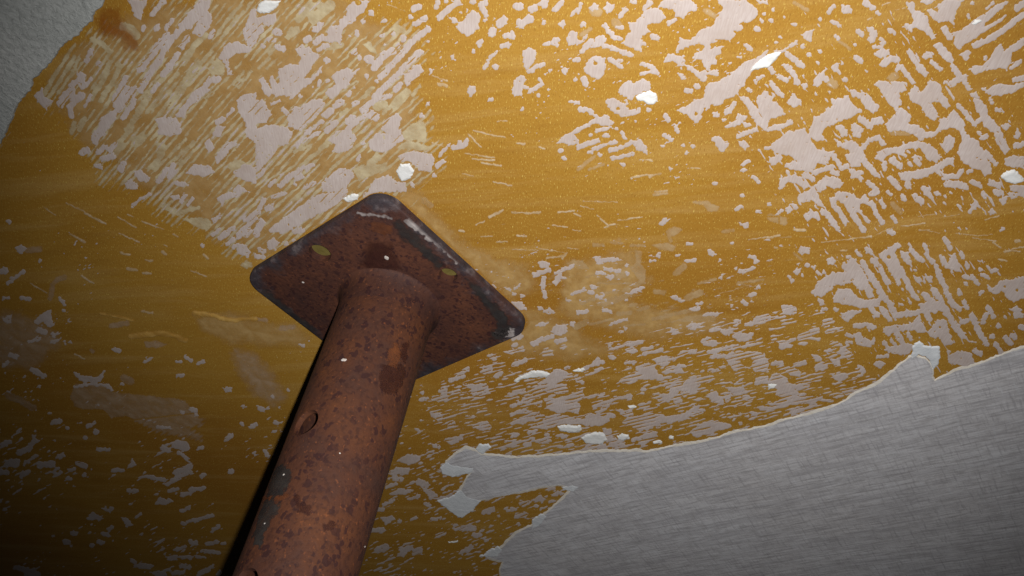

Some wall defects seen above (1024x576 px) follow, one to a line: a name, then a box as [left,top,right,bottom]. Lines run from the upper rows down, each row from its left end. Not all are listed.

peeling [34,34,103,119]
peeling [78,0,456,260]
peeling [0,266,32,301]
peeling [0,296,126,525]
peeling [13,419,226,576]
peeling [175,355,206,378]
peeling [222,394,292,462]
peeling [362,0,1024,576]